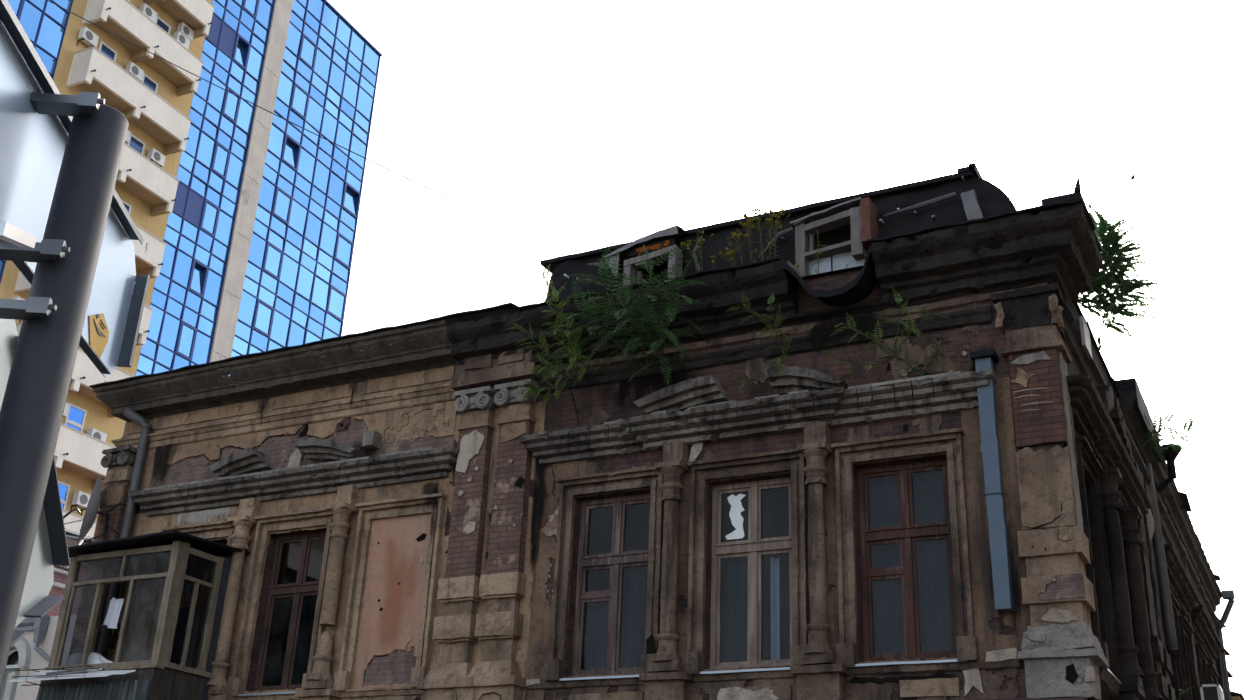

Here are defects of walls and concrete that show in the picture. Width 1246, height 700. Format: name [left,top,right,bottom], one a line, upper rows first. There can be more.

flaking render [150,417,454,488]
spalling [363,644,417,686]
spalling [1065,664,1082,684]